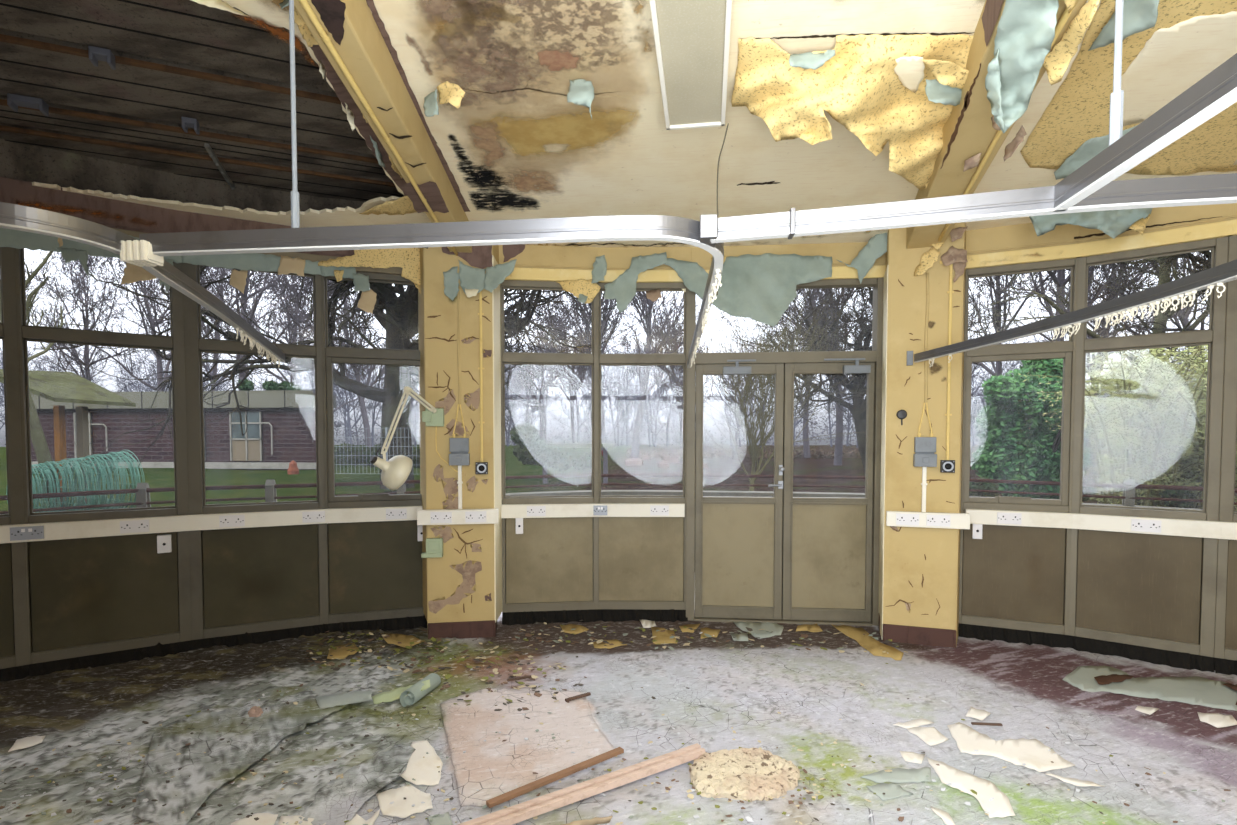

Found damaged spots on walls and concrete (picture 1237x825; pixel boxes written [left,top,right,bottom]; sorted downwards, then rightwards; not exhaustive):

water stain [407,0,618,105]
peeling [982,0,1004,46]
peeling [310,0,470,213]
water stain [449,110,635,211]
crack [425,296,491,436]
peeling [430,526,454,543]
peeling [428,543,492,614]
crack [453,528,482,558]
peeling [1135,706,1159,715]
peeling [1197,712,1237,728]